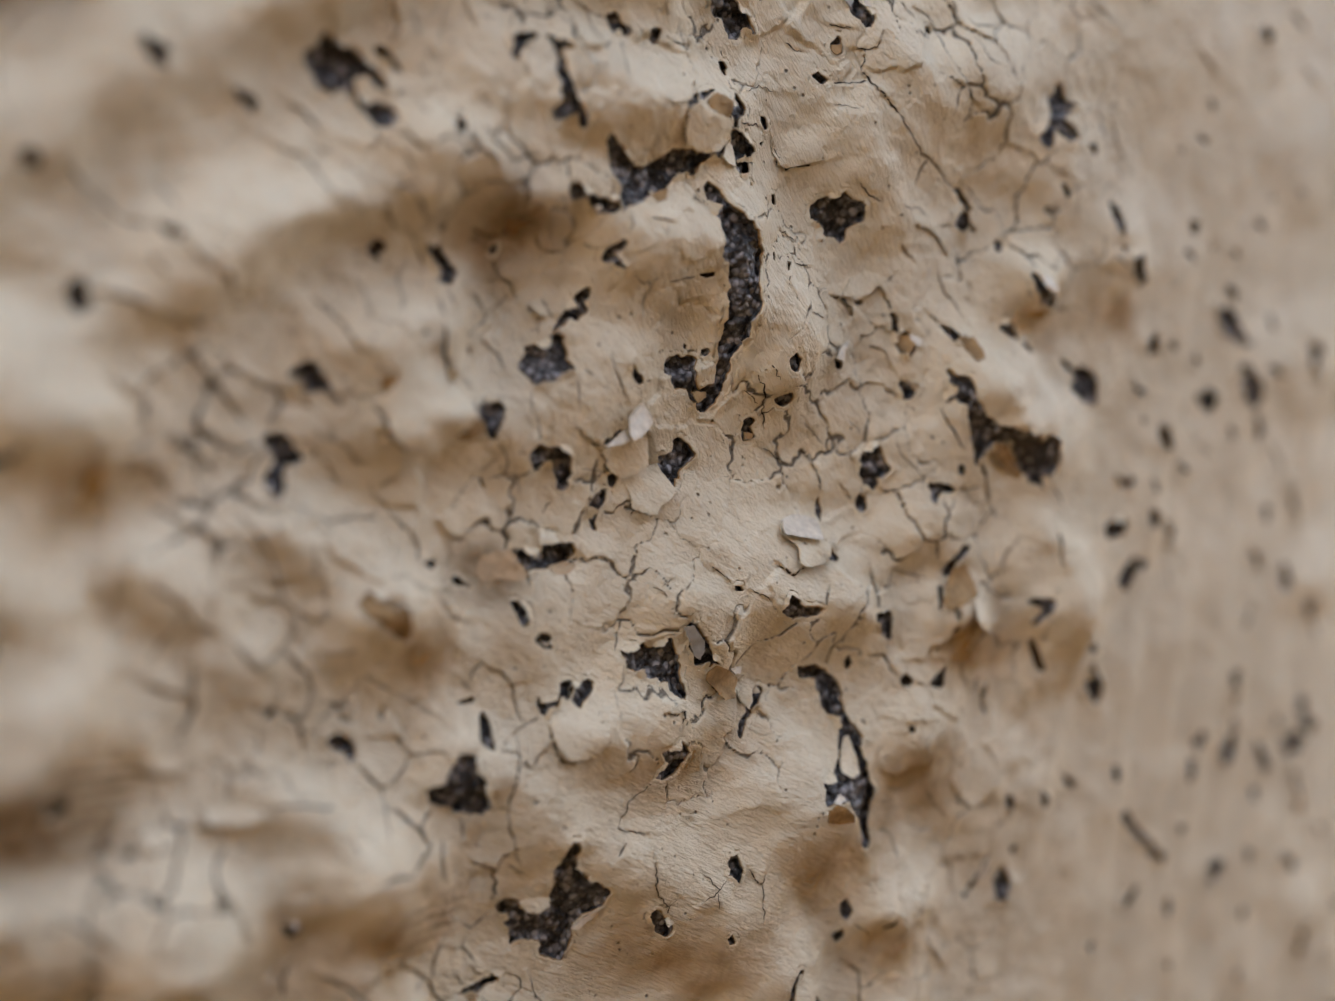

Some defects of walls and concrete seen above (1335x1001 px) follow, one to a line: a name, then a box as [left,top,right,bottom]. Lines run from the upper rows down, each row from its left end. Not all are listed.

spalling [298,22,410,137]
crack [742,122,811,171]
crack [814,24,958,323]
spalling [417,0,829,655]
crack [738,365,852,499]
spalling [924,314,1064,508]
crack [713,564,803,602]
spalling [420,691,502,821]
spalling [793,651,878,855]
crack [317,661,596,1001]
spalling [489,837,617,966]
crack [702,870,766,923]